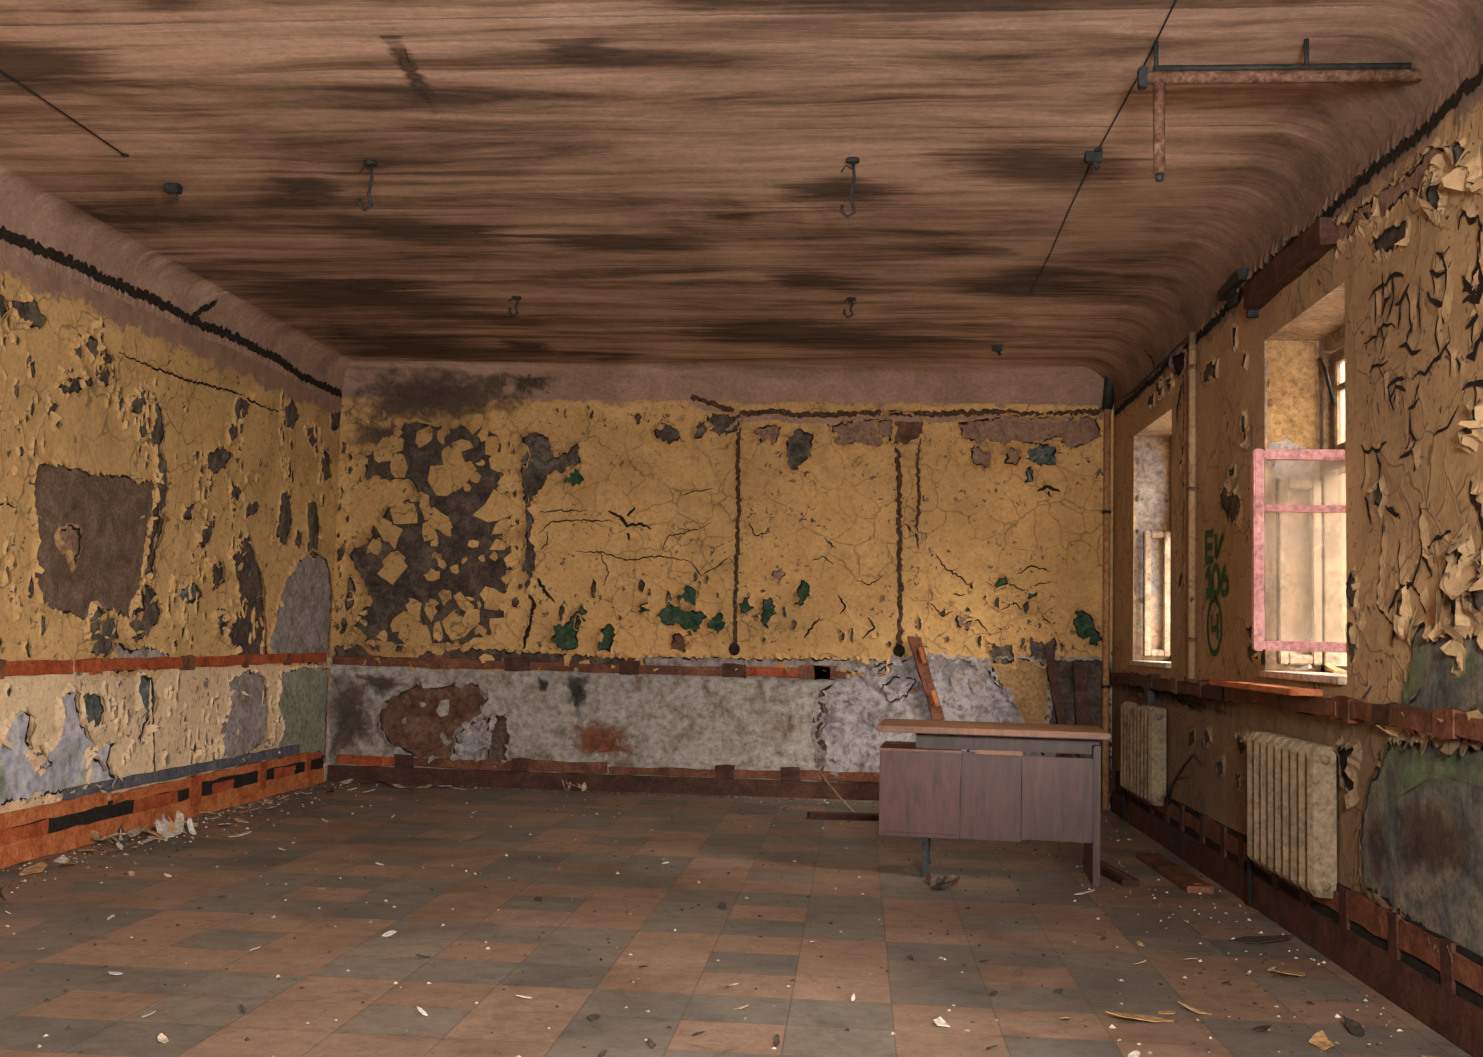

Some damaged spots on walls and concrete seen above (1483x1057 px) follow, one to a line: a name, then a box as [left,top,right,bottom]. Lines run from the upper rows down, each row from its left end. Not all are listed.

peeling [0,276,1112,813]
crack [688,49,1483,648]